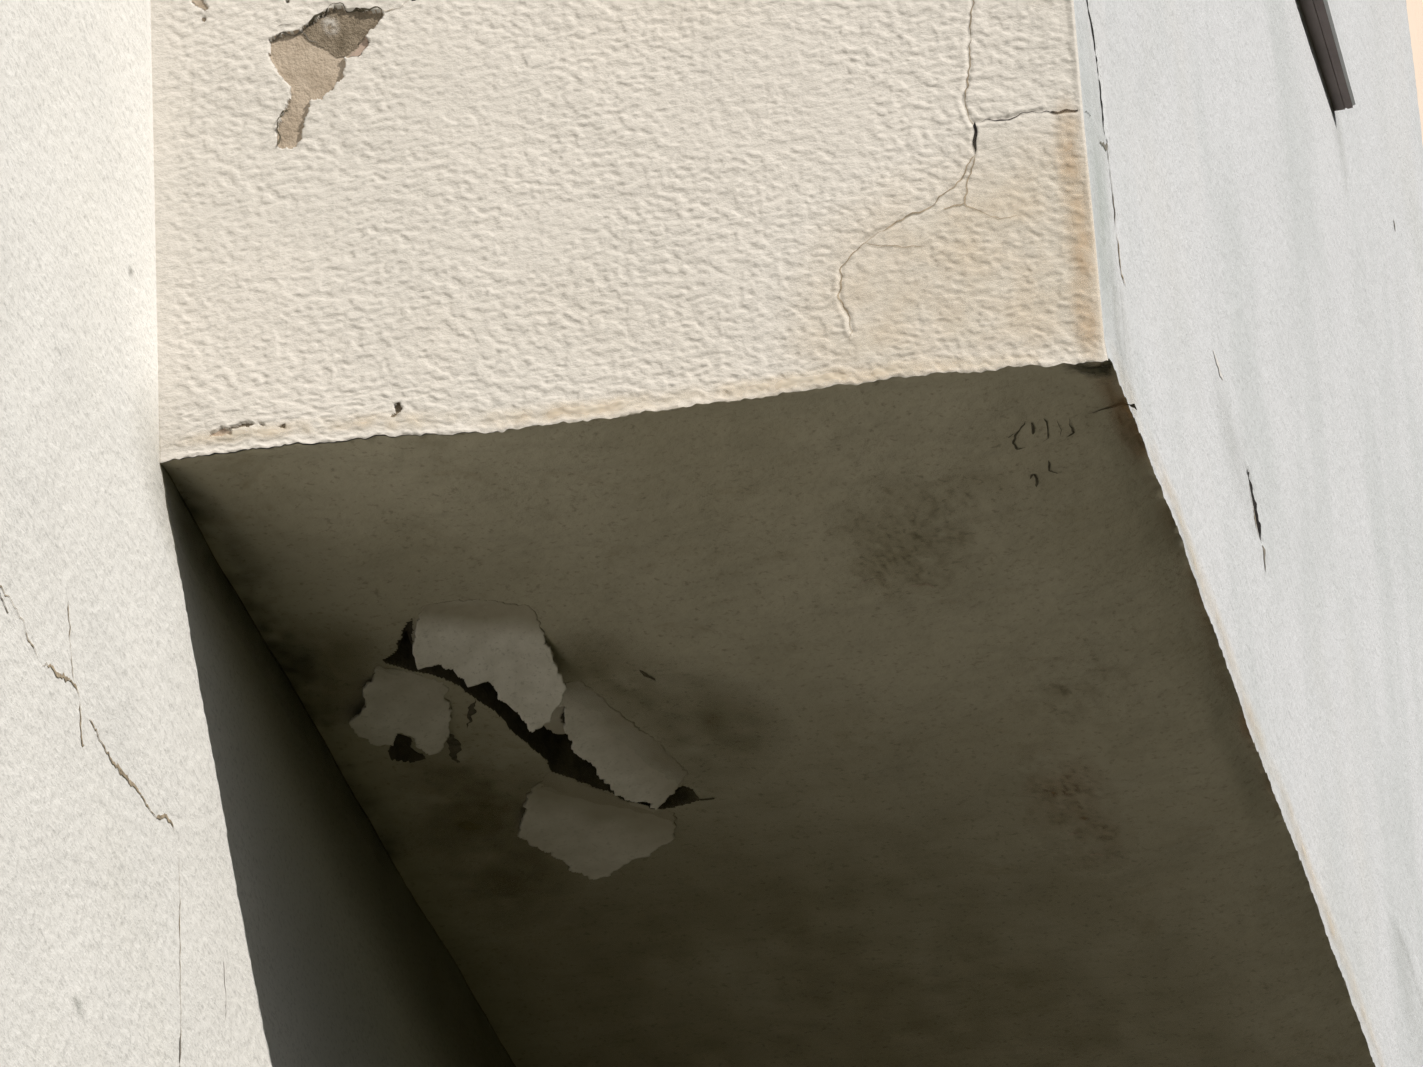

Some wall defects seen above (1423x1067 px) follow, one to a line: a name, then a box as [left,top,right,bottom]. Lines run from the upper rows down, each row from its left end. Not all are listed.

peeling [269,0,416,149]
crack [837,0,1126,335]
crack [1247,470,1266,570]
crack [0,585,181,998]
peeling [349,599,715,880]